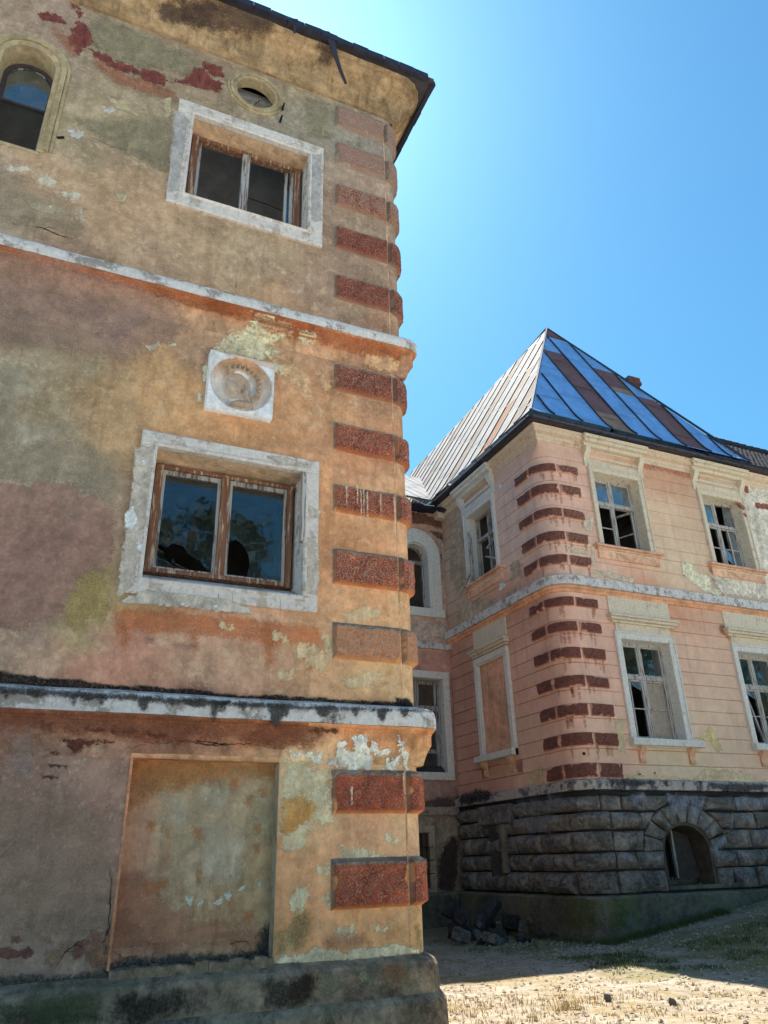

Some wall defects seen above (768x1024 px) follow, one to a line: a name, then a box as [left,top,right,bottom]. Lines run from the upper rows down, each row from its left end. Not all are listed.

peeling [37,4,225,191]
water stain [157,0,274,38]
water stain [317,42,338,73]
peeling [214,313,332,420]
peeling [681,486,768,601]
peeling [42,726,168,780]
water stain [0,671,433,781]
peeling [277,727,409,852]
crack [55,877,139,969]
water stain [0,873,308,1024]
water stain [264,969,341,1009]
peeling [275,923,419,964]